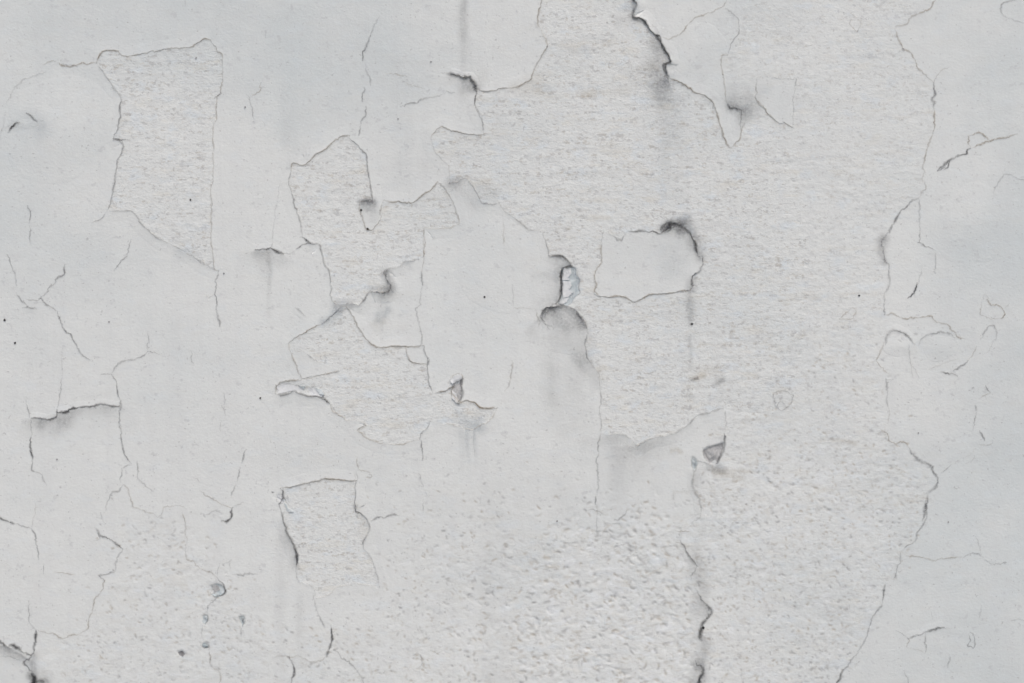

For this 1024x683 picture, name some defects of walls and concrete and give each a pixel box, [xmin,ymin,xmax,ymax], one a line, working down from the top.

peeling [88,29,233,280]
crack [253,242,307,254]
peeling [266,0,804,456]
crack [881,324,943,343]
crack [30,390,120,456]
spalling [691,443,724,469]
crack [220,505,233,522]
peeling [269,468,389,608]
crack [0,634,37,683]